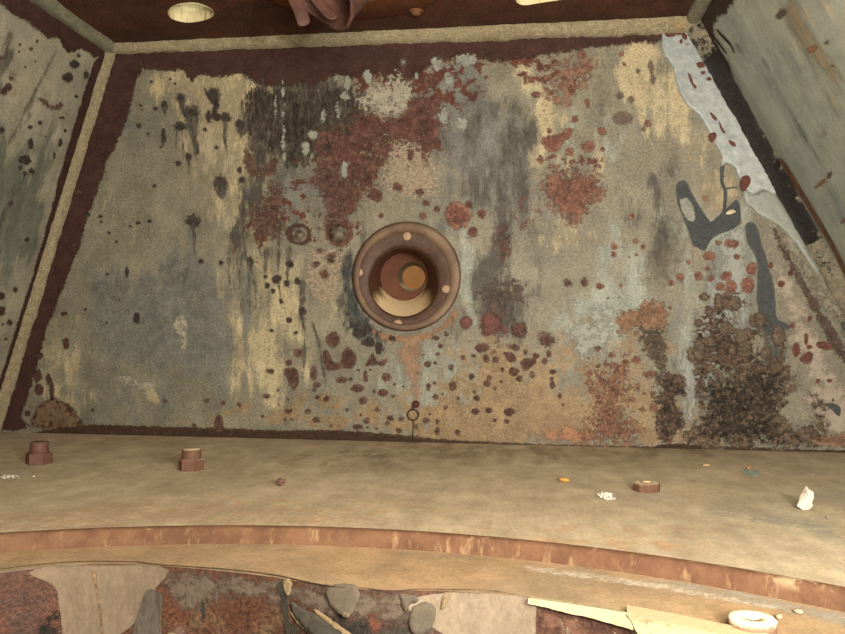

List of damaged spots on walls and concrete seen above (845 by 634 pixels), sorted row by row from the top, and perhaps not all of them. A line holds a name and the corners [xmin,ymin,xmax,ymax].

rust [0,0,662,440]
rust [534,226,845,451]
peeling [661,32,845,435]
rust [537,609,589,634]